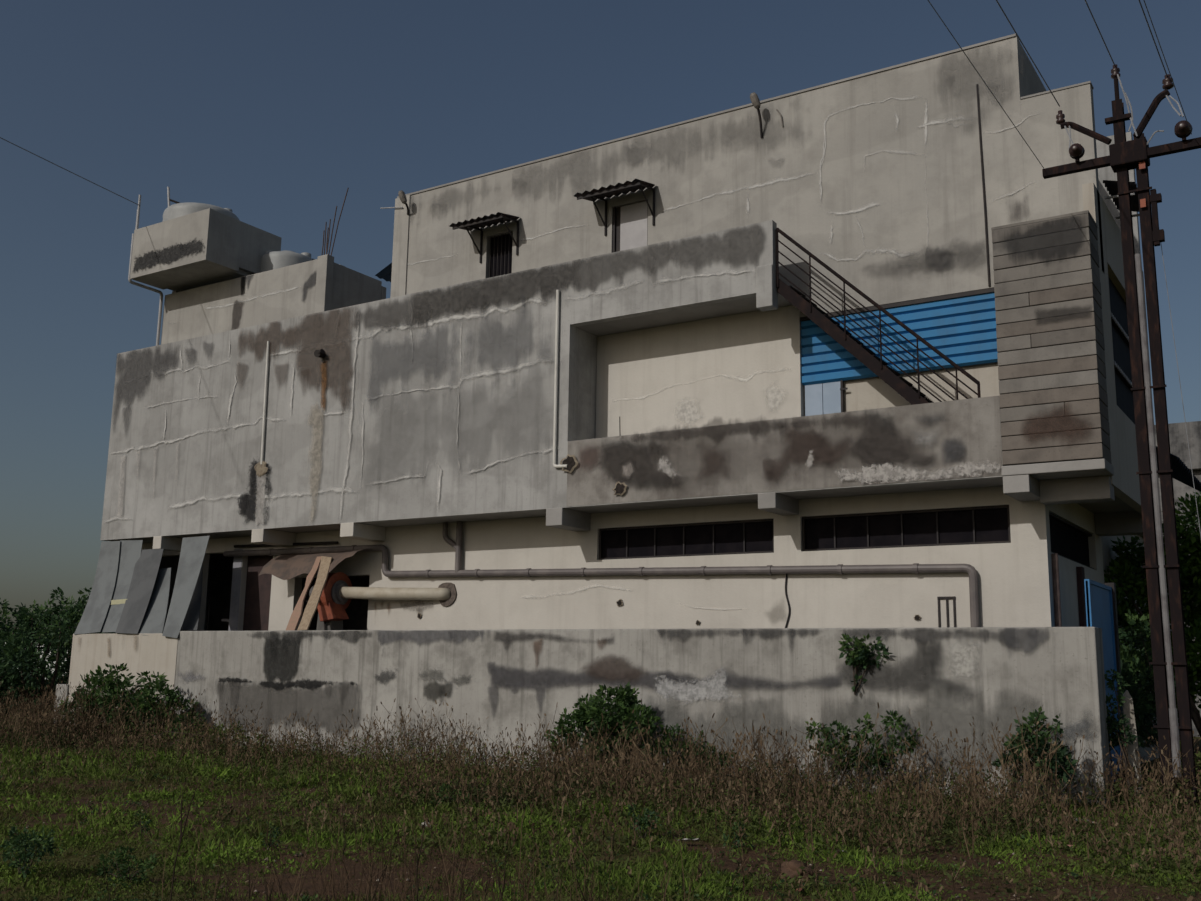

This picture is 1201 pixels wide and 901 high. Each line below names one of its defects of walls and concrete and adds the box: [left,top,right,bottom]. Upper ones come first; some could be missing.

crack [666,97,965,261]
leakage [133,239,205,273]
leakage [232,225,763,407]
leakage [114,349,177,414]
crack [113,339,301,454]
crack [170,271,747,516]
leakage [580,389,965,487]
leakage [237,458,271,524]
leakage [219,630,479,691]
leakage [491,657,787,691]
leakage [730,629,817,638]
leakage [807,628,1047,696]